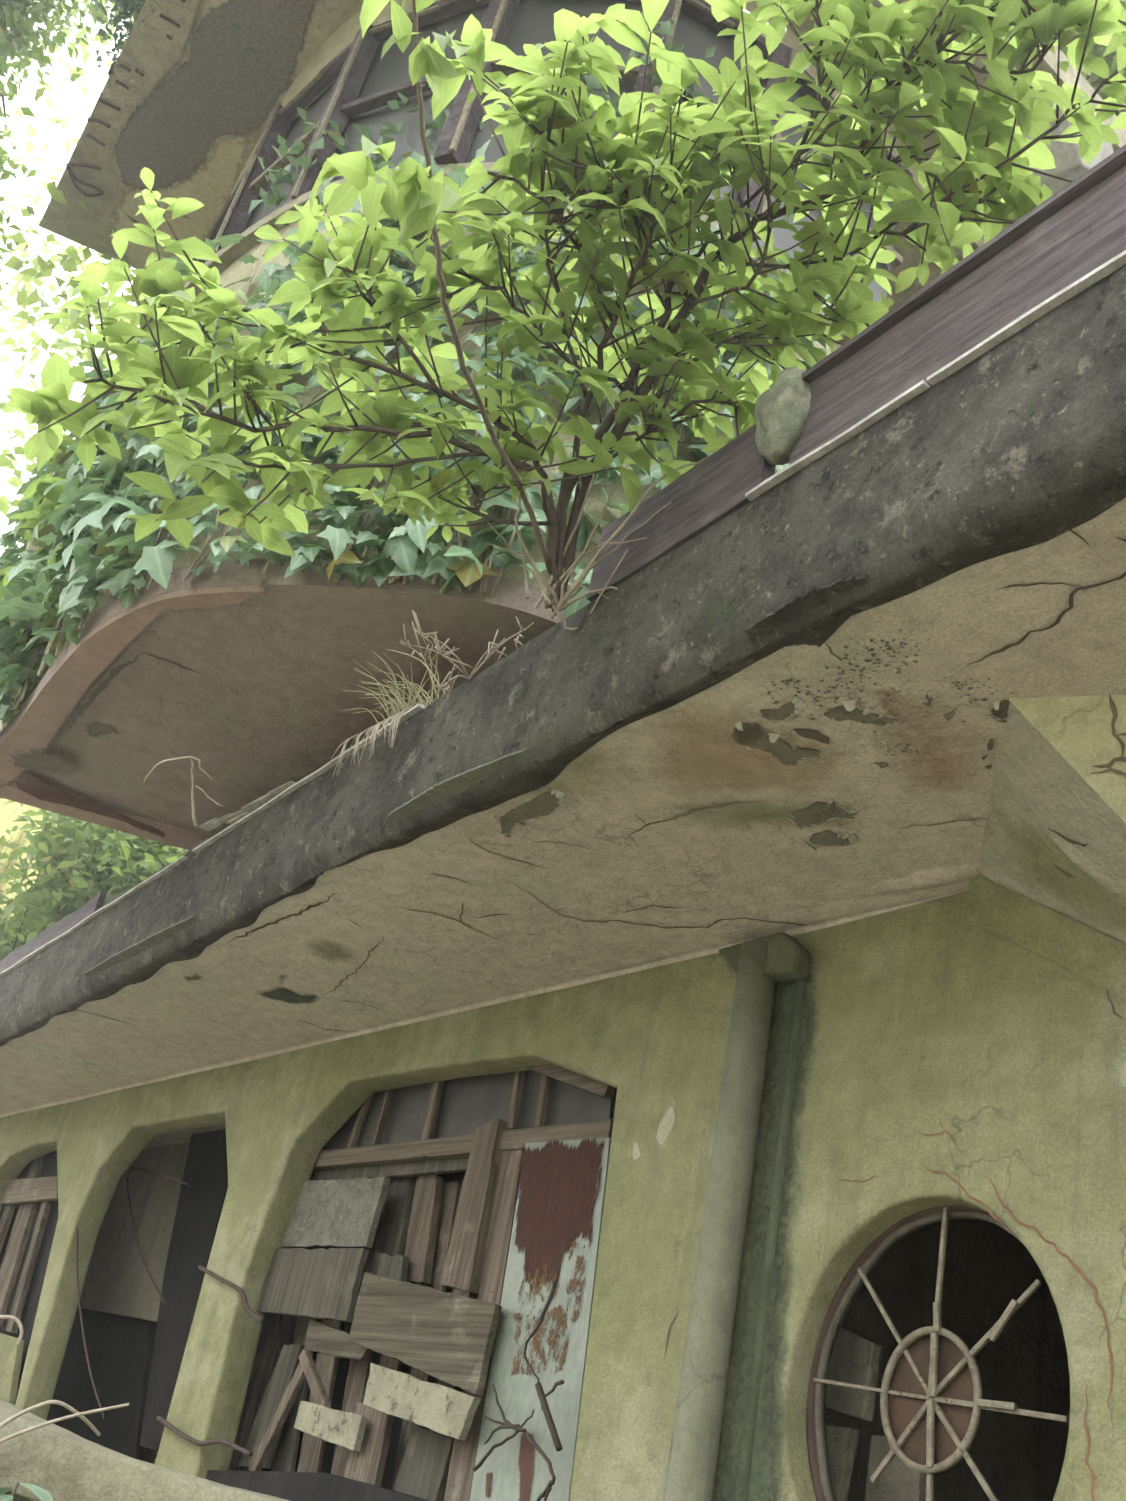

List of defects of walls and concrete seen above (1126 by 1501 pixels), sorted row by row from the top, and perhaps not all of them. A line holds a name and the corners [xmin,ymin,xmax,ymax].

spalling [66,0,200,197]
peeling [107,134,250,269]
crack [965,530,1126,667]
crack [1092,694,1126,779]
spalling [494,789,565,838]
spalling [786,799,860,850]
crack [228,801,806,1032]
corrosion [511,1138,604,1375]
crack [915,1119,1112,1501]
corrosion [518,1433,535,1501]